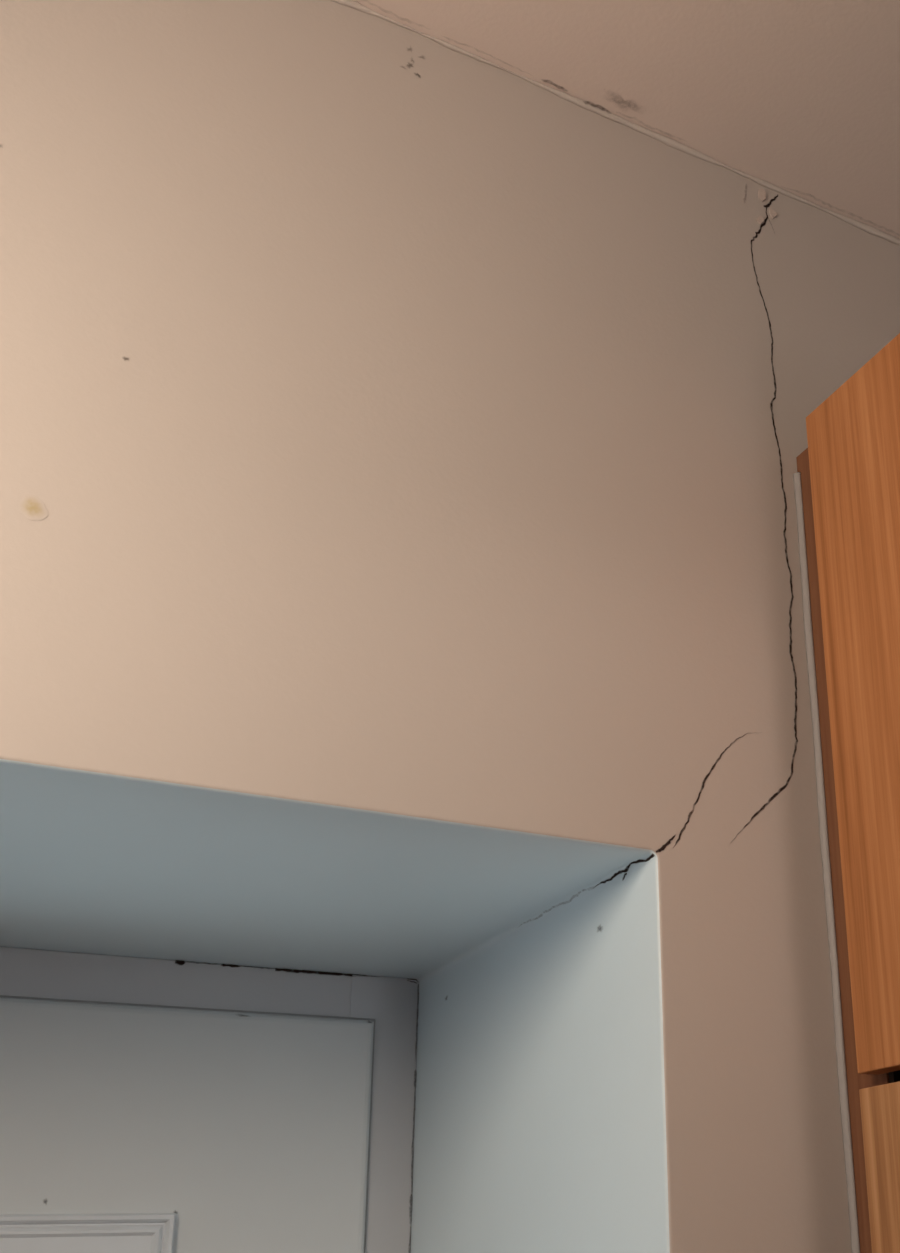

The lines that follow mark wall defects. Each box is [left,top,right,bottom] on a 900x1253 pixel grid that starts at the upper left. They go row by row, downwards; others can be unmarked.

crack [595,733,747,887]
crack [735,188,798,838]